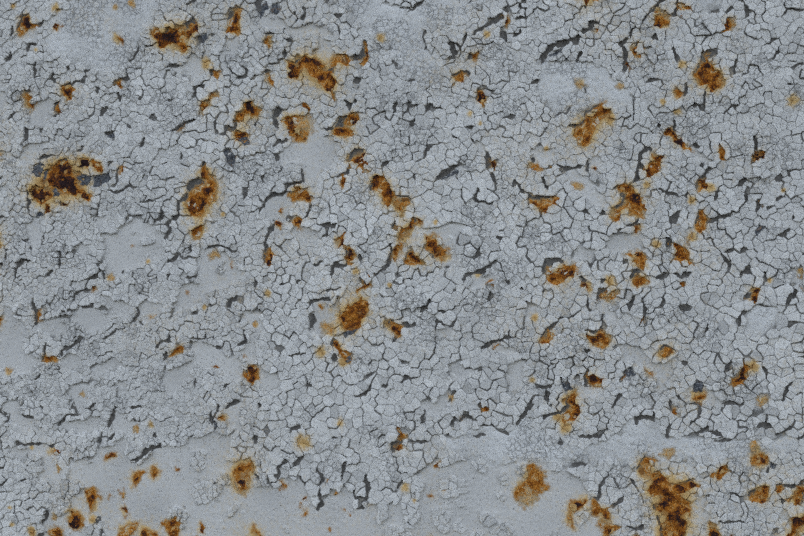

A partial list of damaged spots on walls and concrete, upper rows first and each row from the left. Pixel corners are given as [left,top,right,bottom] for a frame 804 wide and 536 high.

crack [154,0,176,34]
crack [378,0,424,14]
rust [287,41,370,106]
rust [31,158,103,214]
rust [185,164,218,240]
crack [0,143,181,536]
rust [320,273,372,364]
rust [48,486,181,536]
peeling [1,401,619,536]
crack [589,457,667,536]
rust [638,448,701,536]
crack [649,433,804,536]